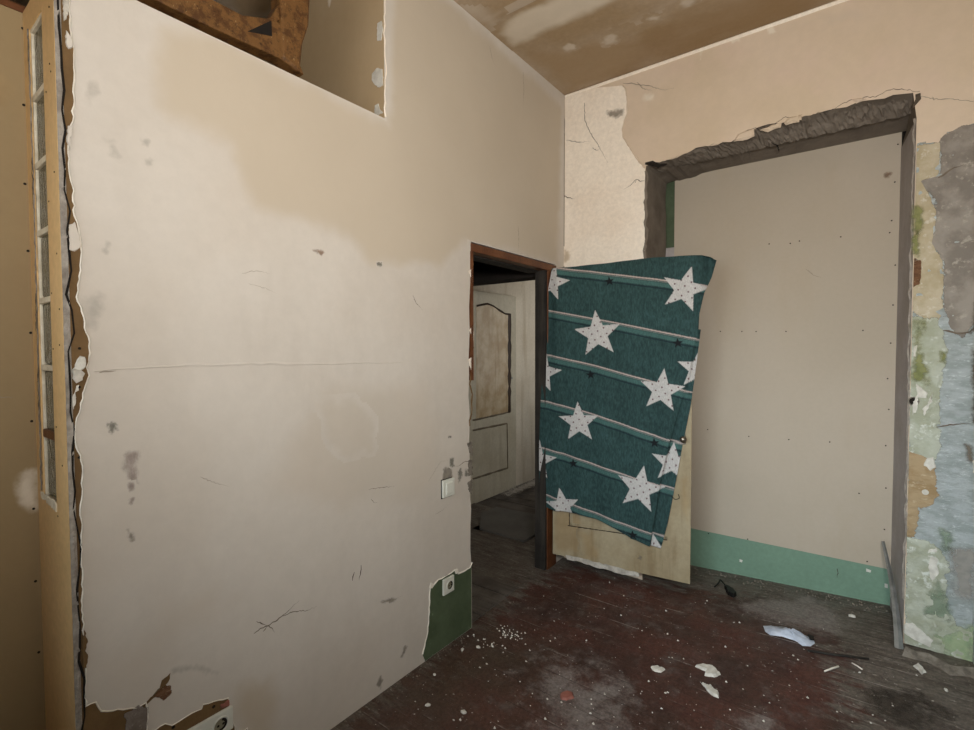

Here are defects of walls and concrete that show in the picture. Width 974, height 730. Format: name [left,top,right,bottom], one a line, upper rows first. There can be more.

peeling [214,0,271,18]
leakage [137,0,877,279]
peeling [564,85,668,267]
peeling [68,222,81,251]
peeling [72,356,86,409]
peeling [902,93,974,659]
crack [254,602,308,634]
peeling [422,562,473,661]
spalling [155,685,172,700]